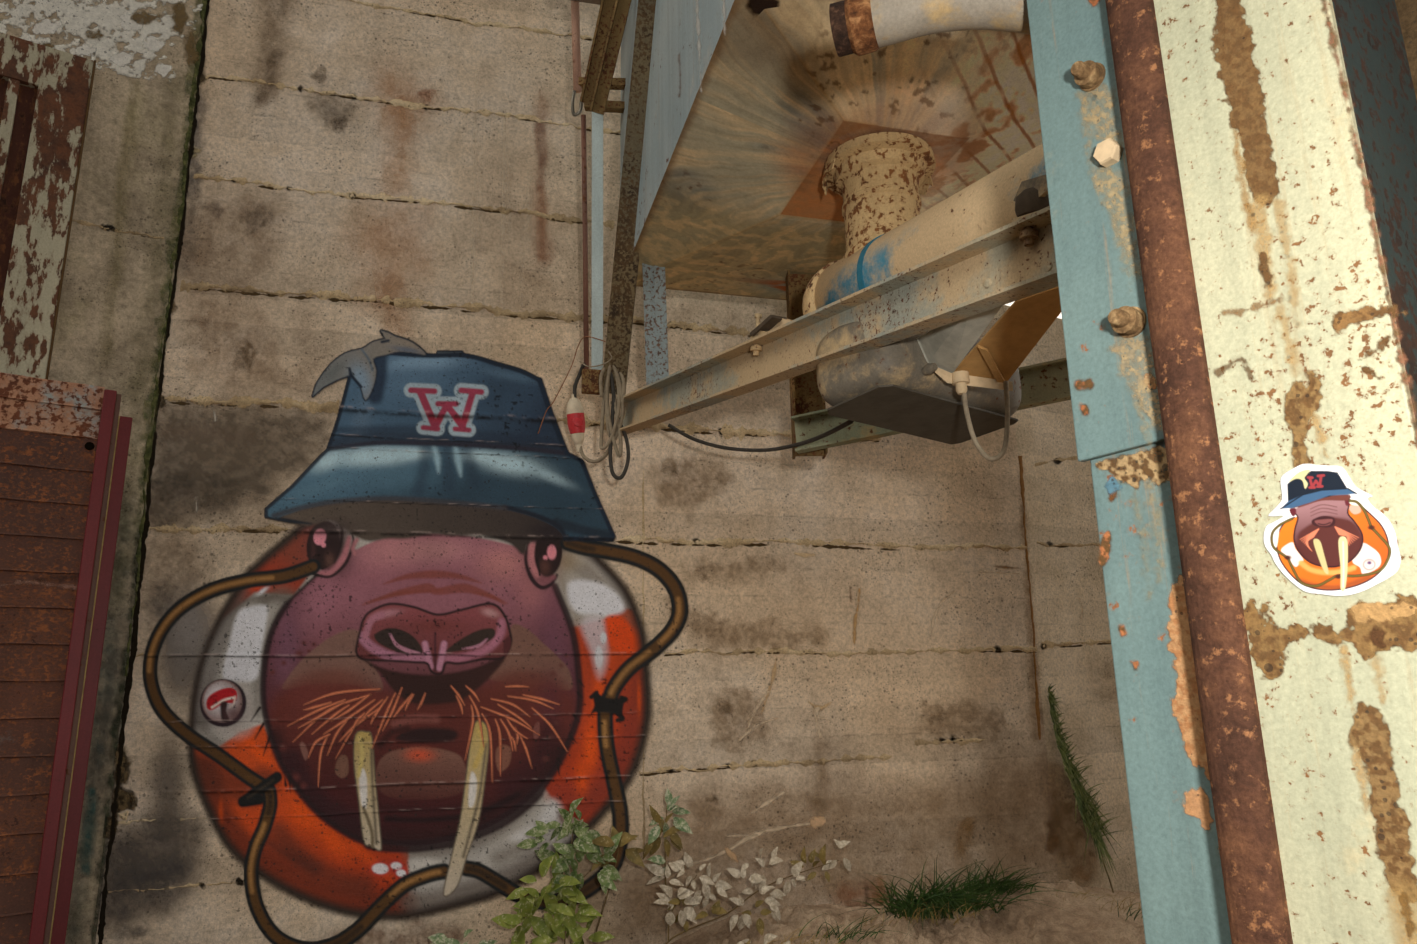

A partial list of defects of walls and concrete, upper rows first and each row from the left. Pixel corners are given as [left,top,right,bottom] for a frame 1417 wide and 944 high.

peeling [0,0,203,79]
crack [91,0,210,944]
corrosion [1214,357,1253,380]
peeling [1167,575,1214,830]